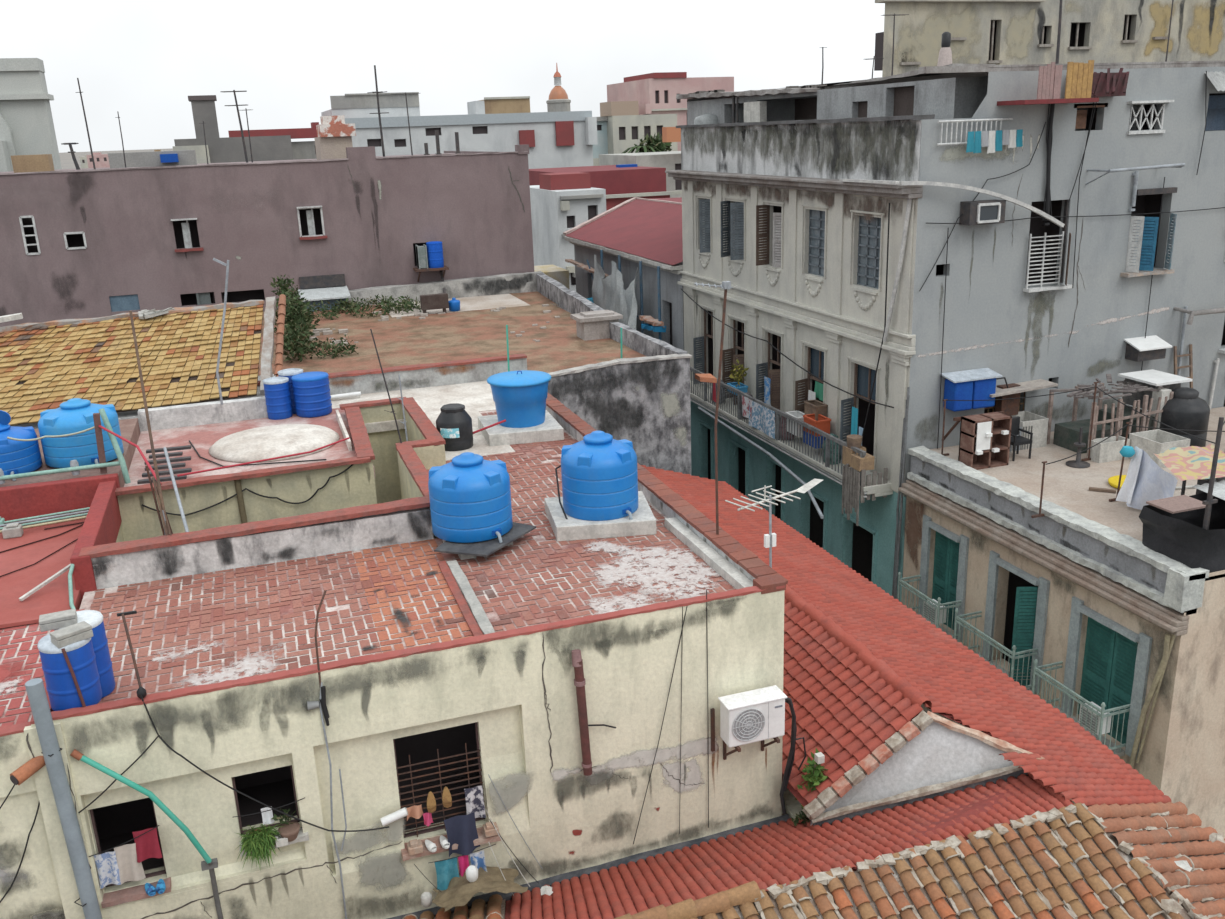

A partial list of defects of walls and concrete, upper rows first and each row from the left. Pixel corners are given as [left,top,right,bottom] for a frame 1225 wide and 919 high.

flaking render [1145,2,1173,56]
flaking render [1187,4,1225,56]
water stain [683,120,918,179]
water stain [394,609,414,634]
water stain [546,541,736,662]
water stain [0,662,22,693]
water stain [153,641,217,661]
water stain [110,655,276,752]
water stain [265,659,433,715]
water stain [516,645,526,673]
water stain [73,727,101,752]